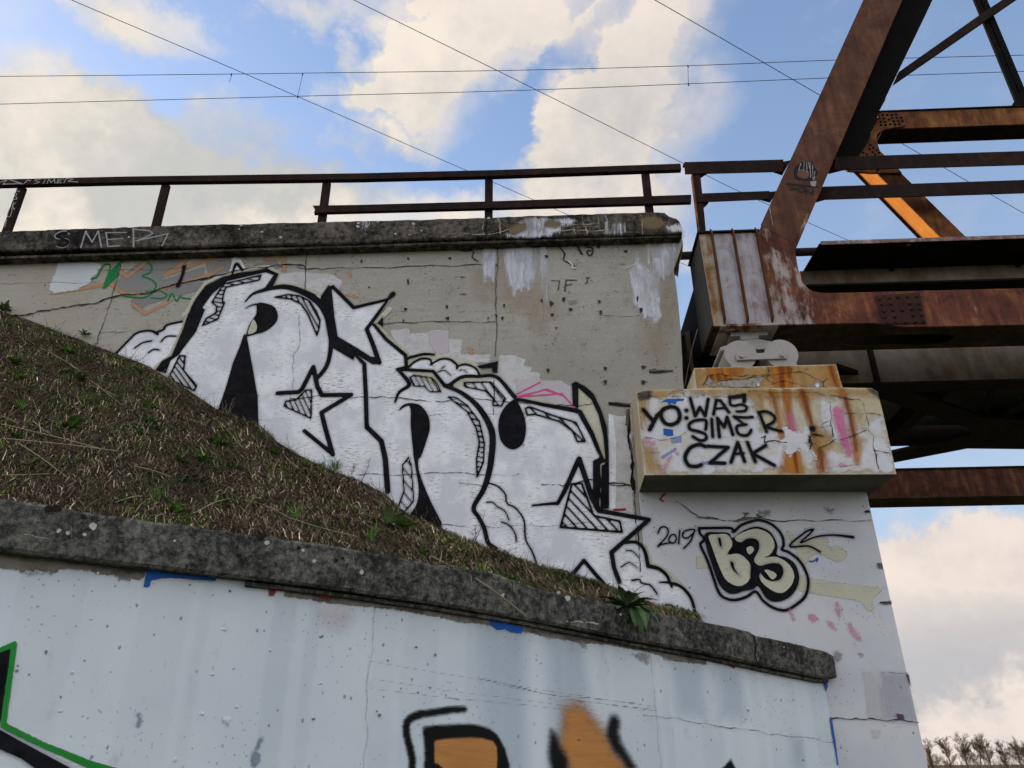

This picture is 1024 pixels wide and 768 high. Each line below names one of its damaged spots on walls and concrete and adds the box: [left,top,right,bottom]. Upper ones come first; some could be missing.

crack [14,264,306,316]
efflorescence [451,215,626,301]
efflorescence [623,216,683,323]
rust [699,234,724,326]
crack [358,368,889,572]
rust [640,365,871,474]